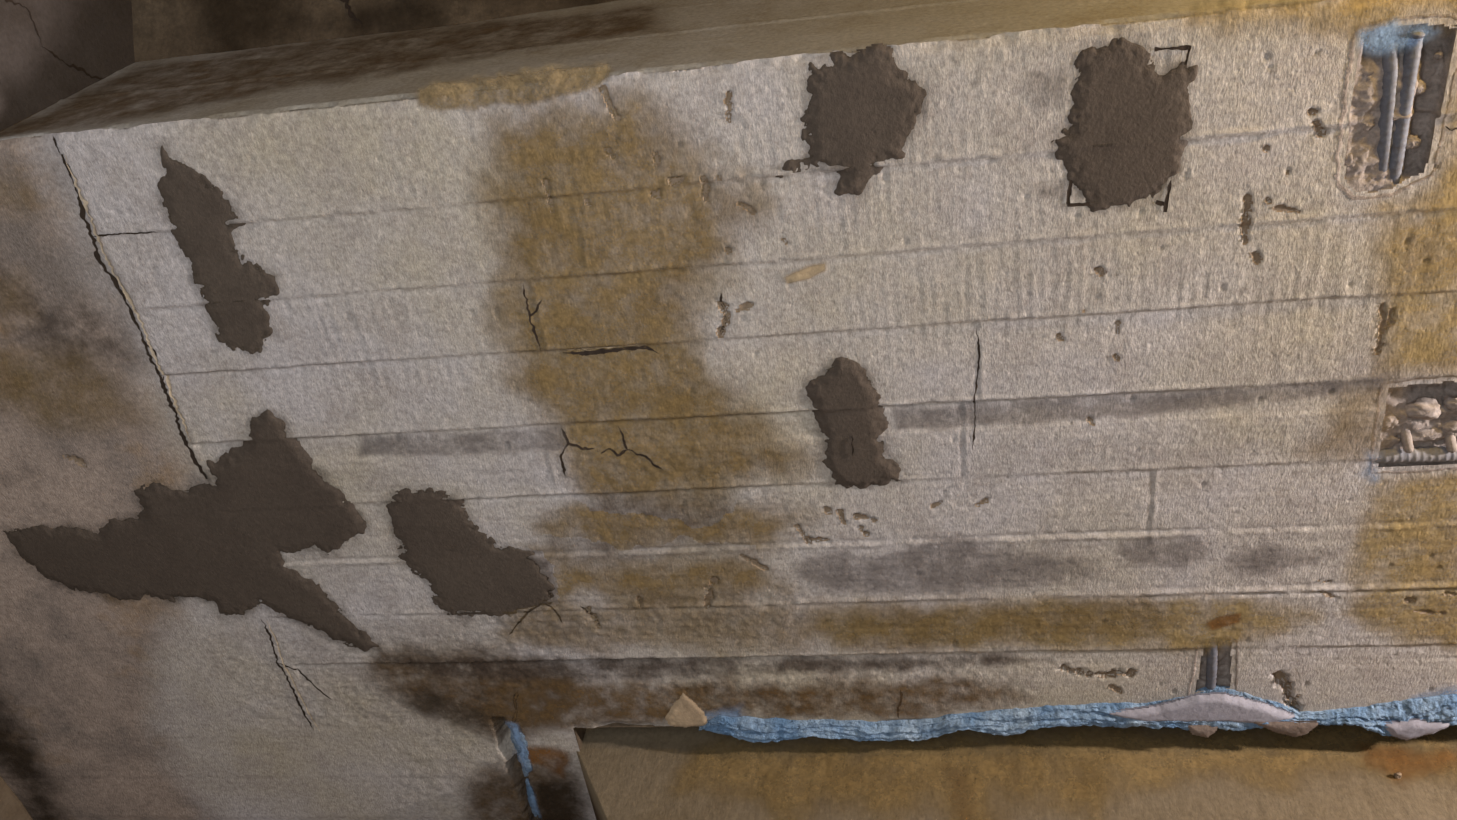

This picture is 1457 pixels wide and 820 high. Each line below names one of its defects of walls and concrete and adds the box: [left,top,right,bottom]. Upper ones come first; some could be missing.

crack [5,0,104,79]
spalling [1307,13,1457,201]
water stain [1387,162,1457,367]
water stain [363,437,435,453]
water stain [492,101,791,603]
water stain [1130,390,1254,415]
water stain [1296,382,1344,396]
spalling [1370,375,1457,474]
water stain [804,543,1078,590]
water stain [1357,476,1457,645]
water stain [807,601,1286,649]
spalling [1188,634,1239,695]